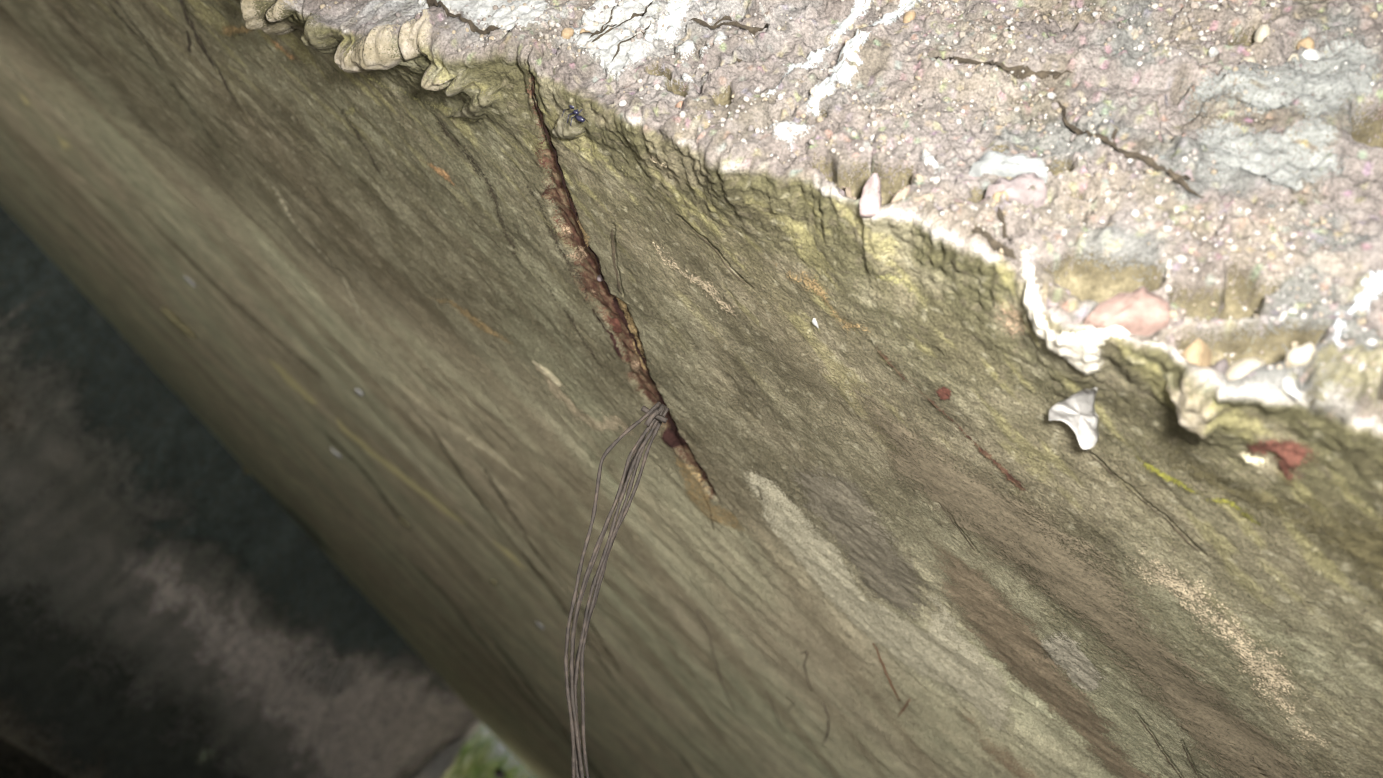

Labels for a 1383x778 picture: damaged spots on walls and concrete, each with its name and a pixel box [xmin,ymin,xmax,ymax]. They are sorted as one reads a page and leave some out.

crack [180,0,265,117]
peeling [416,0,550,34]
peeling [569,0,727,98]
spalling [709,79,734,106]
peeling [770,103,829,152]
spalling [1227,25,1258,47]
peeling [1178,30,1383,205]
spalling [809,149,947,218]
spalling [961,143,1077,208]
spalling [1041,245,1331,377]
damp [137,208,469,534]
peeling [532,360,641,436]